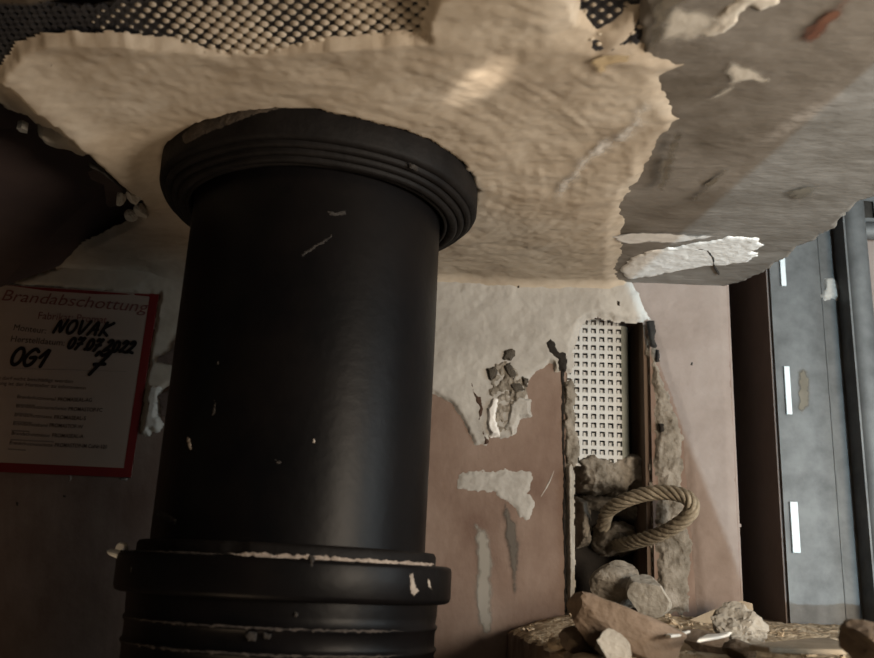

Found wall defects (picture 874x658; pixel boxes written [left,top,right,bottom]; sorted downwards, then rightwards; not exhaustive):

rust [805,6,842,42]
flaking render [141,386,169,436]
spalling [486,349,532,438]
spalling [547,339,580,467]
spalling [646,321,684,487]
spalling [651,500,684,527]
spalling [651,528,693,615]